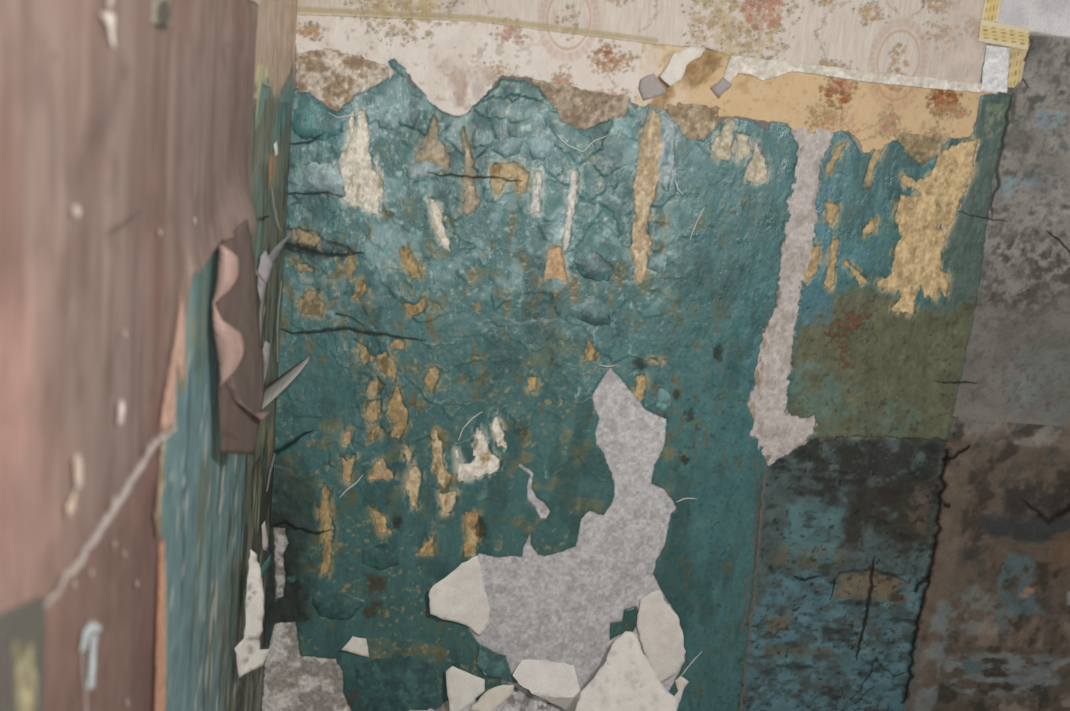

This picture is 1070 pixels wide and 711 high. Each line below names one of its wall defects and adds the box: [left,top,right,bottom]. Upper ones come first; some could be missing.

peeling [262,59,798,711]
peeling [786,93,1012,441]